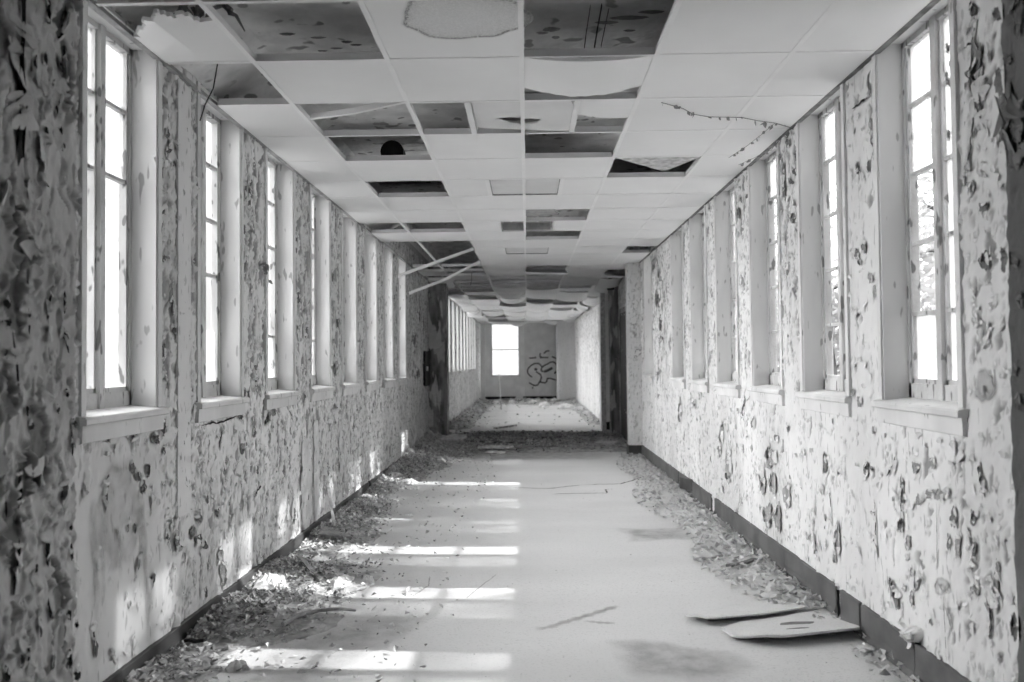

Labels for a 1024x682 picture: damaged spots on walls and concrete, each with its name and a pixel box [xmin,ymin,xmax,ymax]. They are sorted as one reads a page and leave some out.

spalling [0,0,83,227]
peeling [0,240,80,430]
peeling [105,75,1019,682]
spalling [944,0,1024,458]
peeling [0,446,53,607]
peeling [0,508,99,682]